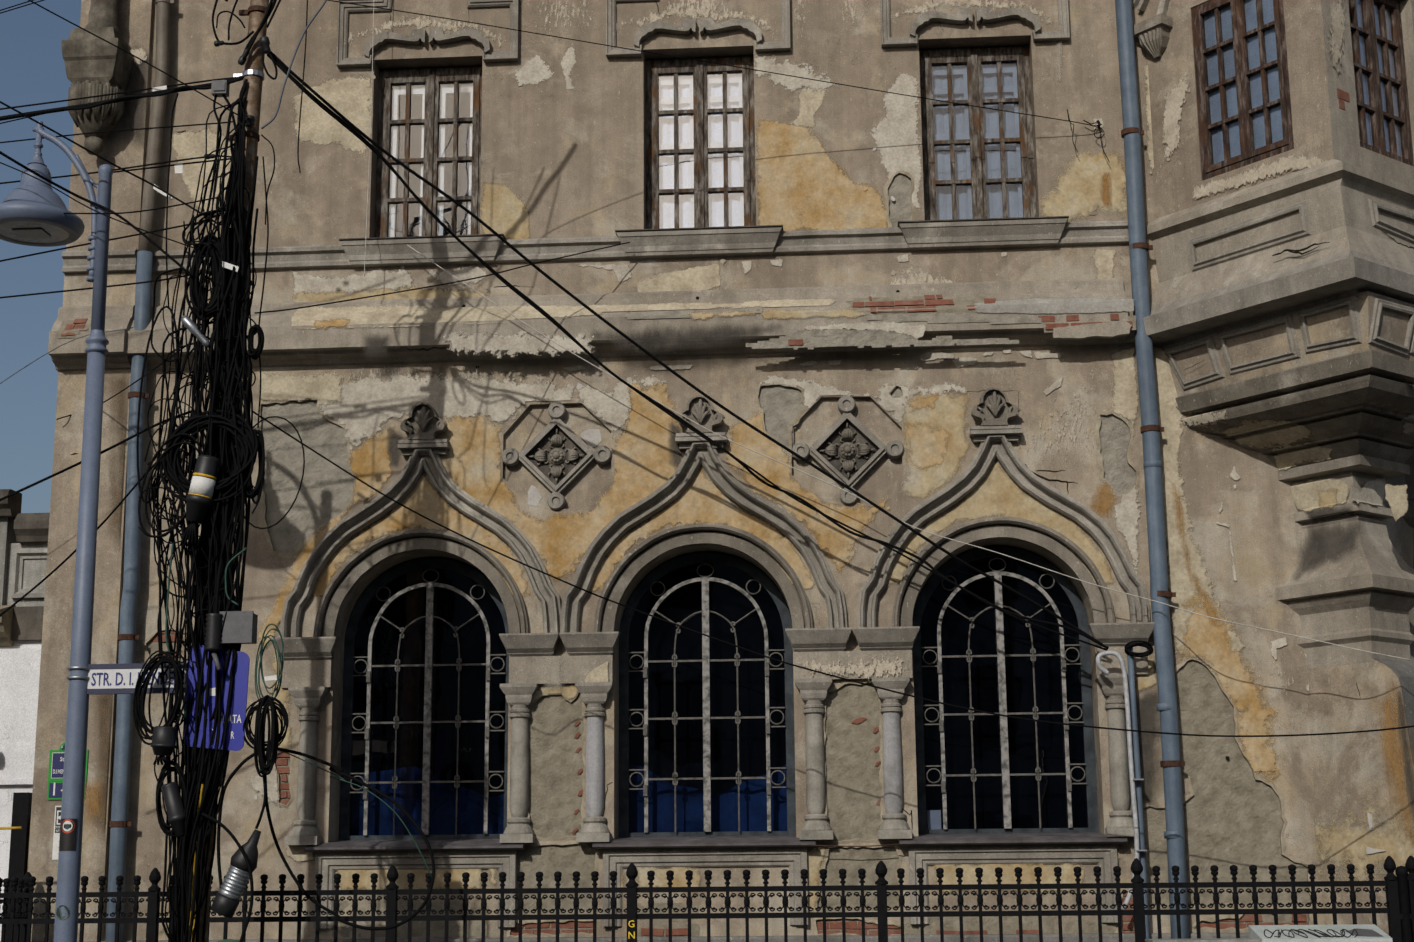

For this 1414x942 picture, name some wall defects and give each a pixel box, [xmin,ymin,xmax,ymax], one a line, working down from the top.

peeling [348,15,506,49]
peeling [515,0,922,231]
peeling [480,182,530,239]
peeling [1040,152,1127,221]
peeling [1093,249,1116,279]
peeling [250,254,1141,809]
spalling [1153,346,1408,933]
spalling [507,661,609,938]
spalling [798,655,1170,935]
peeling [285,845,314,862]
spalling [332,869,496,938]
peeling [621,867,701,937]